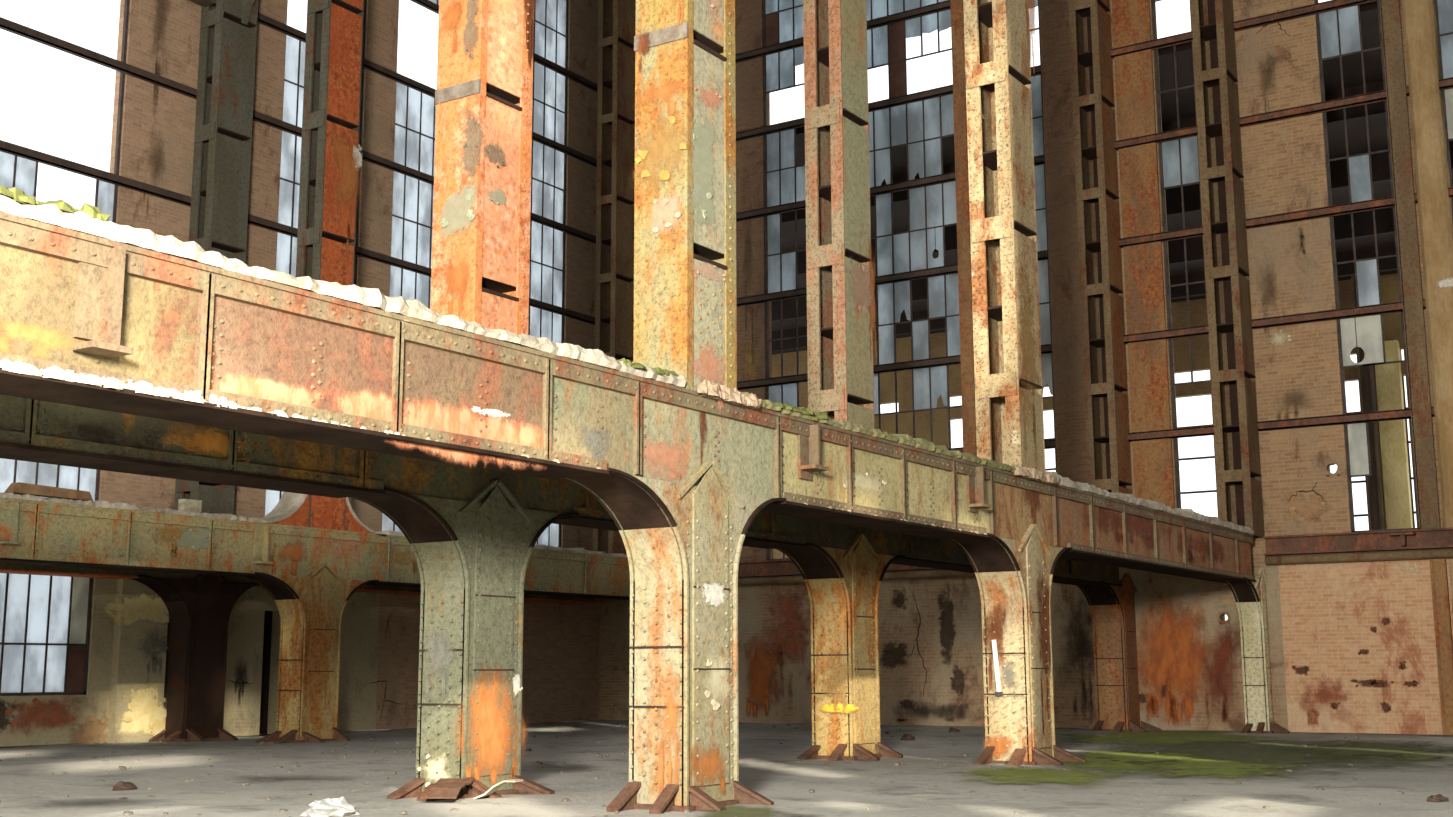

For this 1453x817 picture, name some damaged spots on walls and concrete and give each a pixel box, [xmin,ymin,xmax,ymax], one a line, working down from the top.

rust [444,2,461,53]
rust [525,0,537,68]
peeling [440,110,506,237]
peeling [635,87,721,234]
rust [444,262,468,315]
rust [210,349,320,408]
rust [338,391,543,466]
rust [747,590,809,716]
rust [1137,602,1233,724]
rust [461,674,526,785]